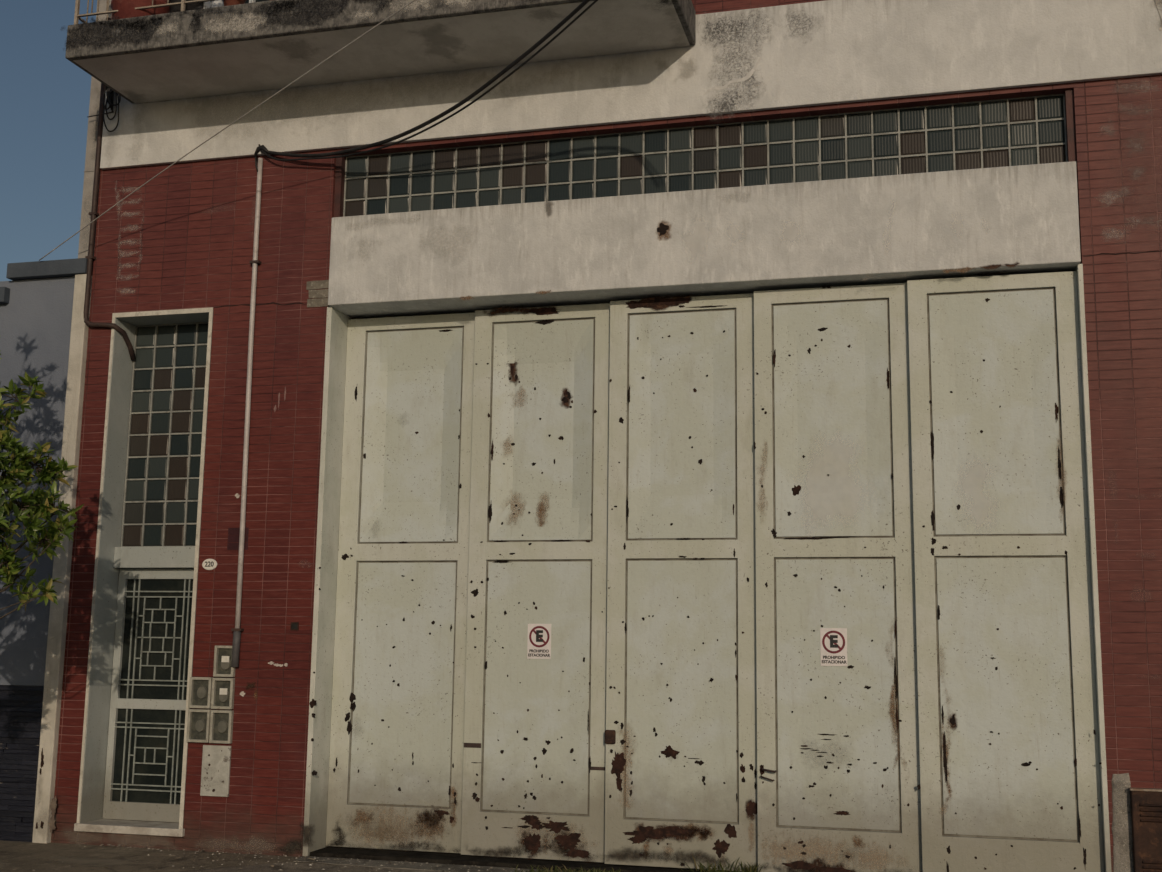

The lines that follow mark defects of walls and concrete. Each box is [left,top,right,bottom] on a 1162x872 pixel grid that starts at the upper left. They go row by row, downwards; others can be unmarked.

damp [66,12,172,49]
damp [189,0,393,33]
damp [707,21,764,114]
corrosion [484,290,559,316]
corrosion [624,295,691,311]
corrosion [509,362,524,405]
corrosion [611,734,632,806]
corrosion [661,745,680,759]
corrosion [942,714,957,794]
corrosion [518,815,591,862]
corrosion [622,800,757,864]
corrosion [782,858,855,872]